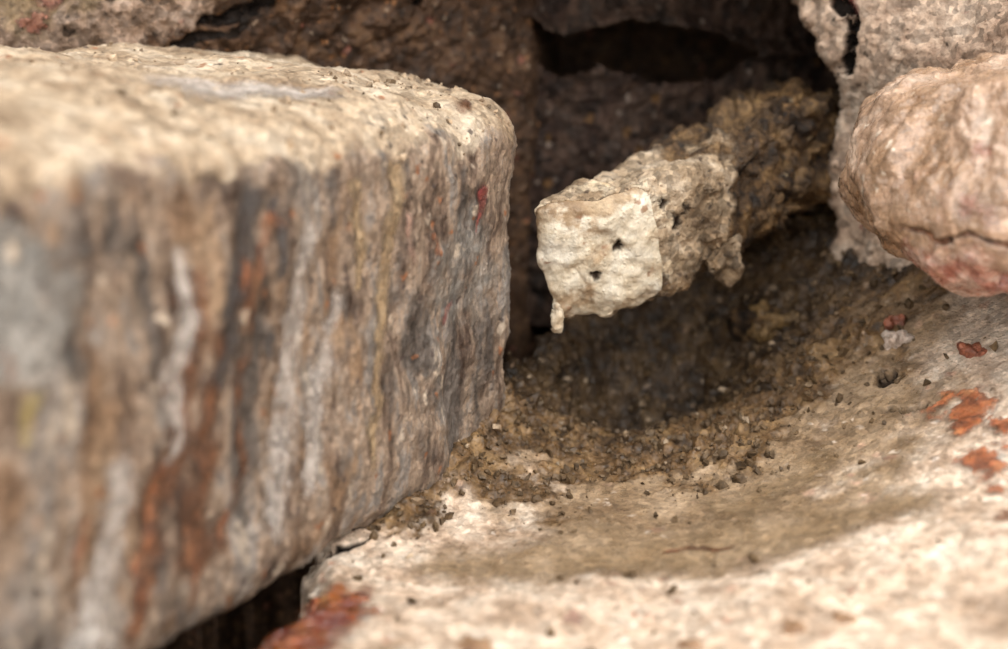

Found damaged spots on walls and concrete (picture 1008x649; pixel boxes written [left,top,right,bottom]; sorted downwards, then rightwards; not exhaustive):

crack [833,0,861,73]
corrosion [926,386,1008,492]
corrosion [260,580,381,649]